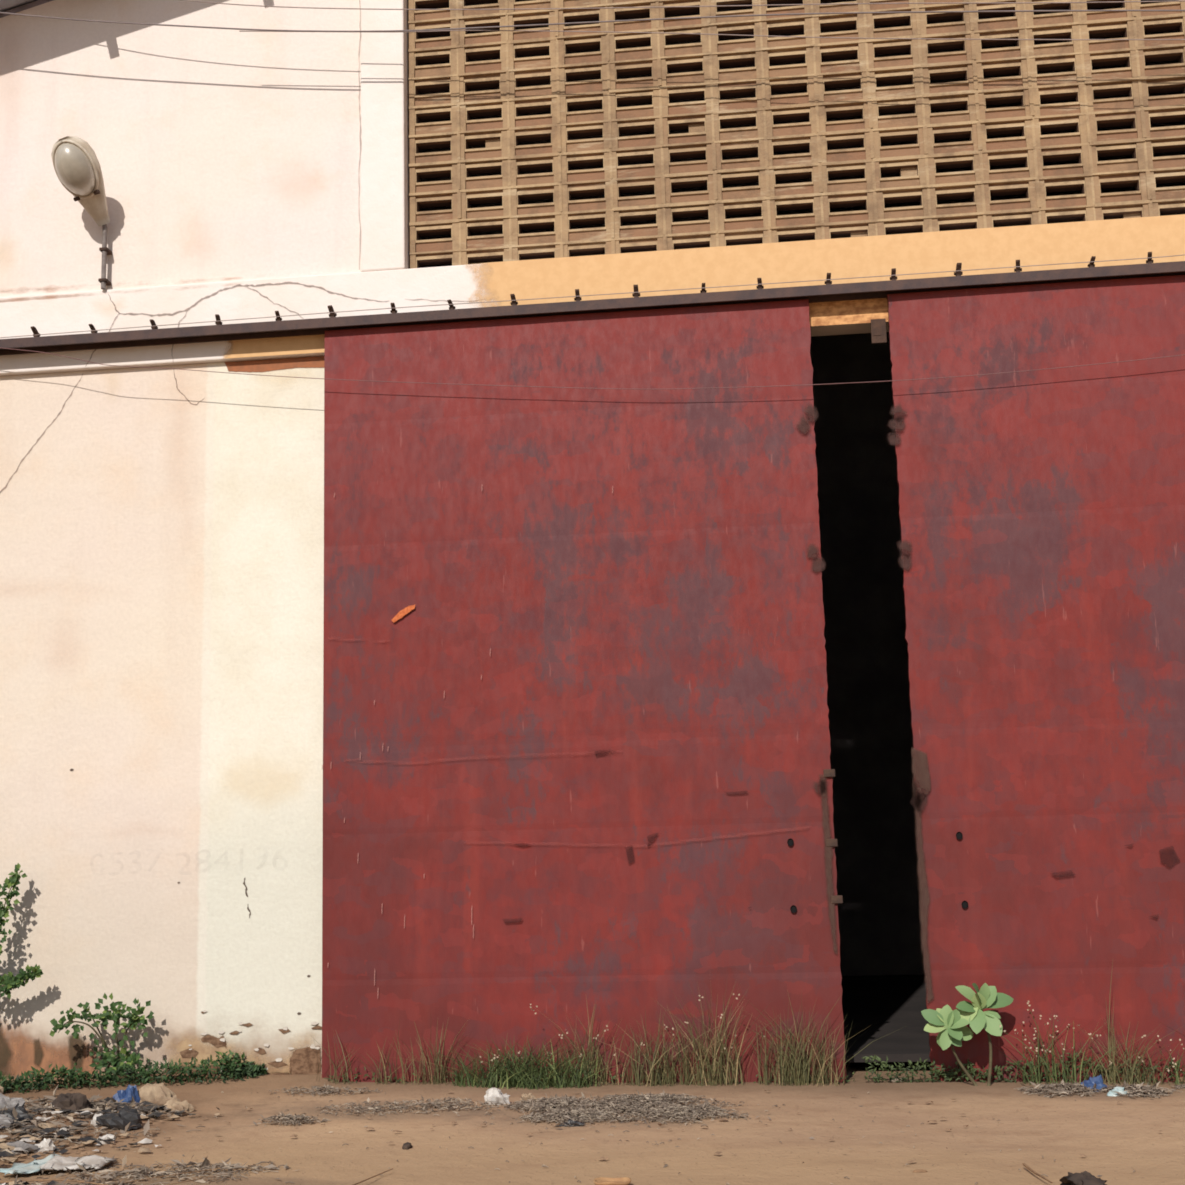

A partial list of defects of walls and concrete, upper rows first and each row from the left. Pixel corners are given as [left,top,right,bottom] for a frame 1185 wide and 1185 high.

rust [797,405,817,433]
rust [889,405,907,445]
rust [899,540,911,570]
rust [815,775,837,953]
rust [911,748,934,1003]
water stain [0,1030,11,1075]
water stain [165,1038,292,1075]
peeling [179,1022,322,1075]